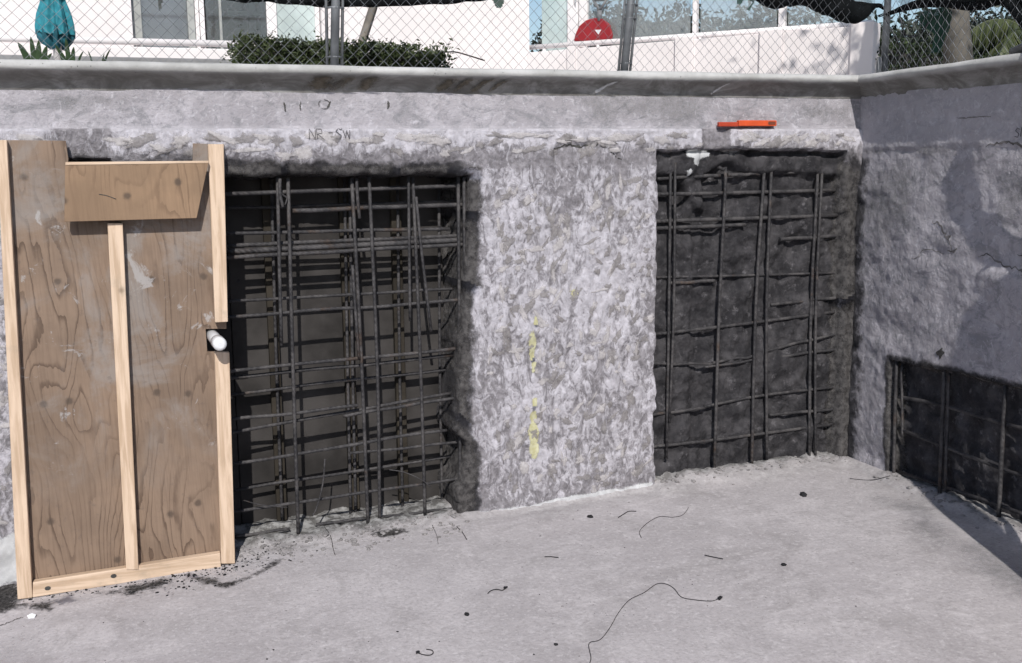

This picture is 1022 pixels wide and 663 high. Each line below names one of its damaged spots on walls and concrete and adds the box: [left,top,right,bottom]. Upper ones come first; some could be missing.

peeling [723,130,857,156]
crack [986,140,1022,148]
crack [911,221,1022,272]
spalling [103,131,838,538]
spalling [892,348,1022,518]